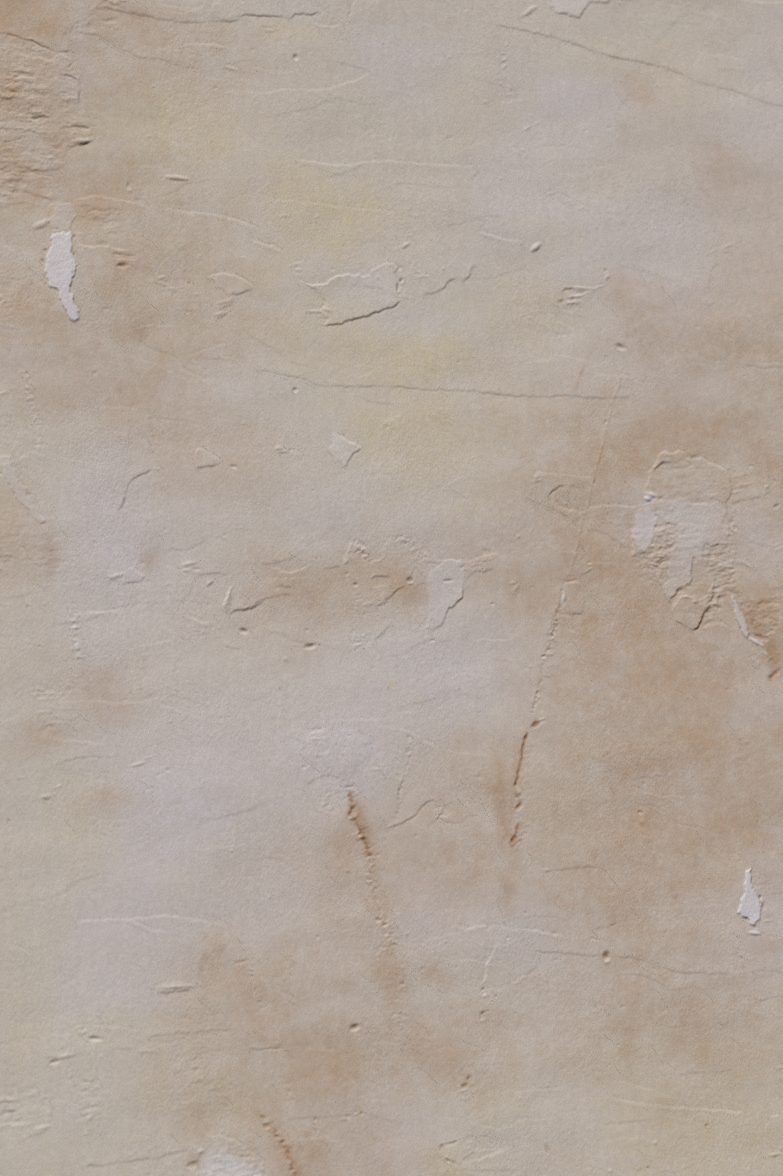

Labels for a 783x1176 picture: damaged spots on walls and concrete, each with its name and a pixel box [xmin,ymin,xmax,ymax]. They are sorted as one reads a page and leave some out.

peeling [30,201,82,324]
water stain [618,406,748,489]
peeling [414,546,501,632]
crack [509,375,622,868]
spalling [630,448,783,684]
water stain [597,576,783,794]
peeling [736,867,775,946]